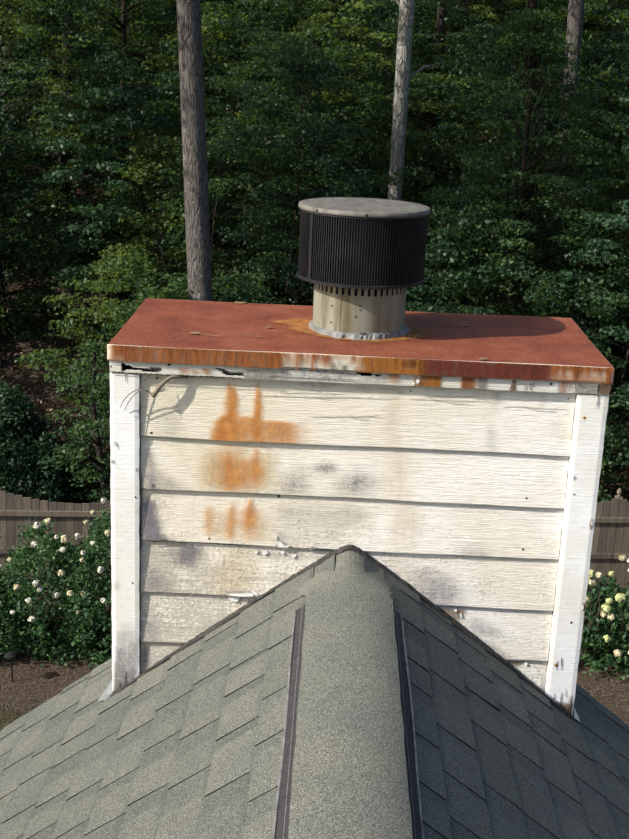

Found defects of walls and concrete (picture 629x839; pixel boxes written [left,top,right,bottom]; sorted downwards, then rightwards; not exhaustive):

rust [275,319,425,341]
crack [109,362,239,381]
rust [110,345,331,372]
rust [351,356,614,389]
rust [211,386,288,443]
rust [208,452,262,491]
rust [227,501,256,535]